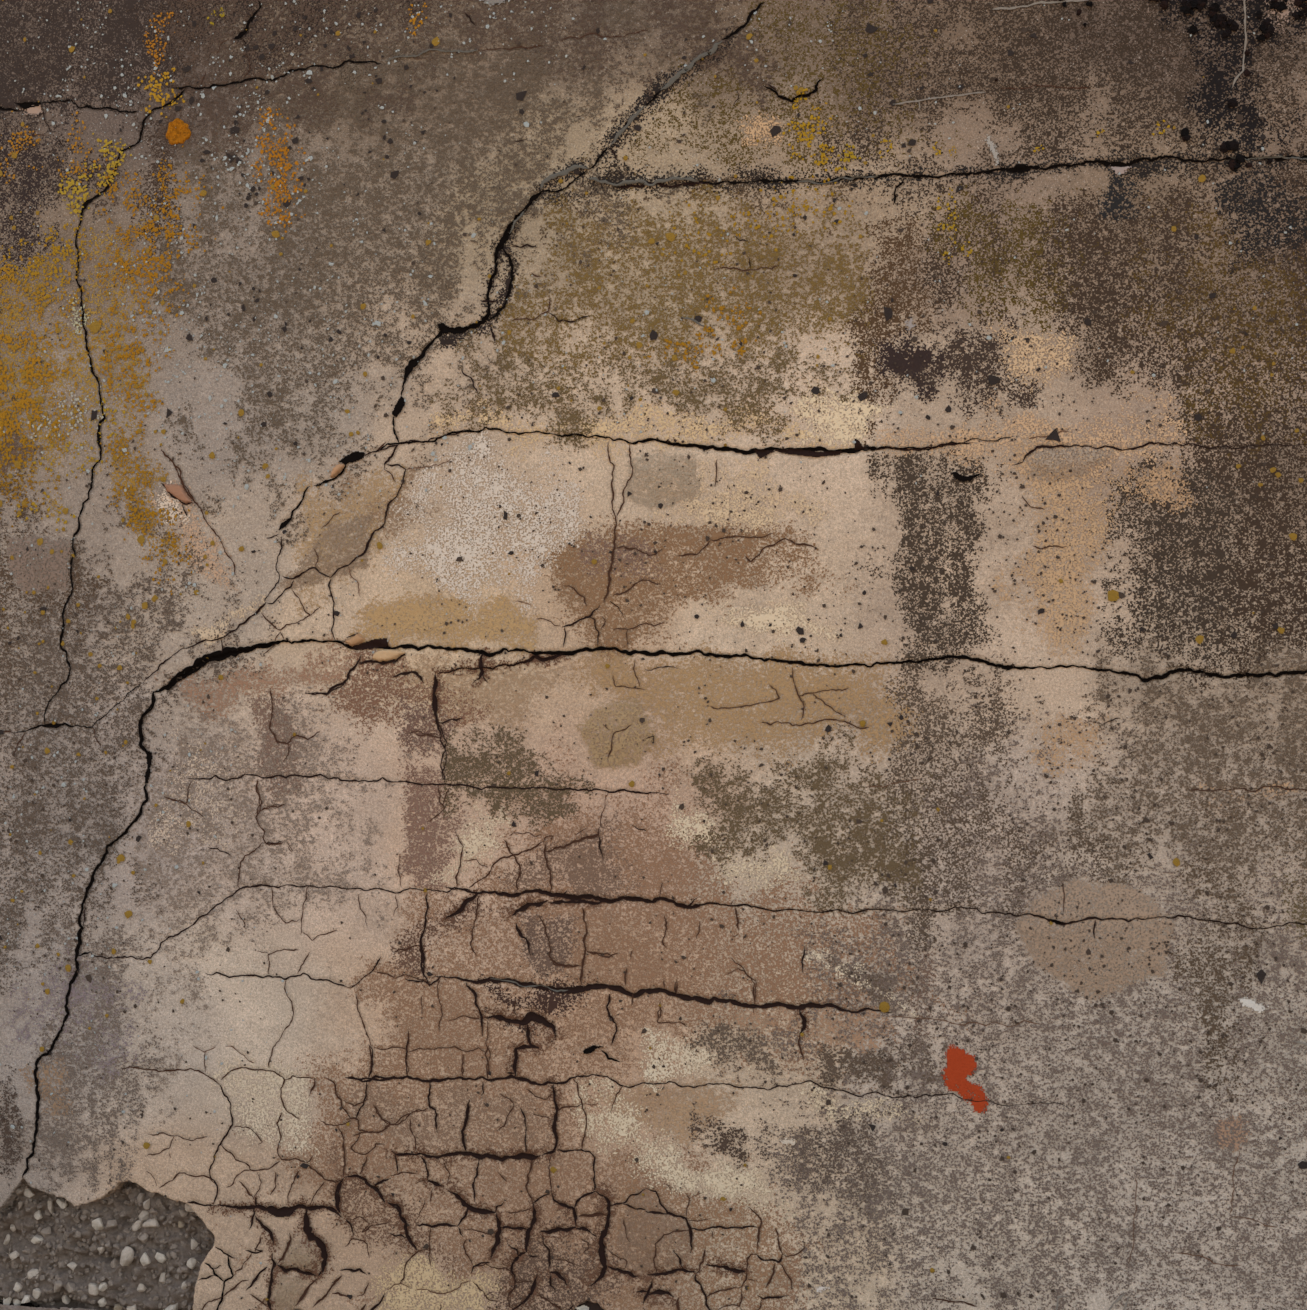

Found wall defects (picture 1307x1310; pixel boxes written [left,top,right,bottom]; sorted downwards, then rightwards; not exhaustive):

crack [733,78,823,106]
crack [896,84,1089,109]
crack [618,155,1307,205]
crack [0,1,790,755]
crack [797,436,1013,454]
crack [1014,430,1307,465]
crack [678,533,815,562]
crack [22,605,1307,1310]
spalling [0,1181,215,1310]